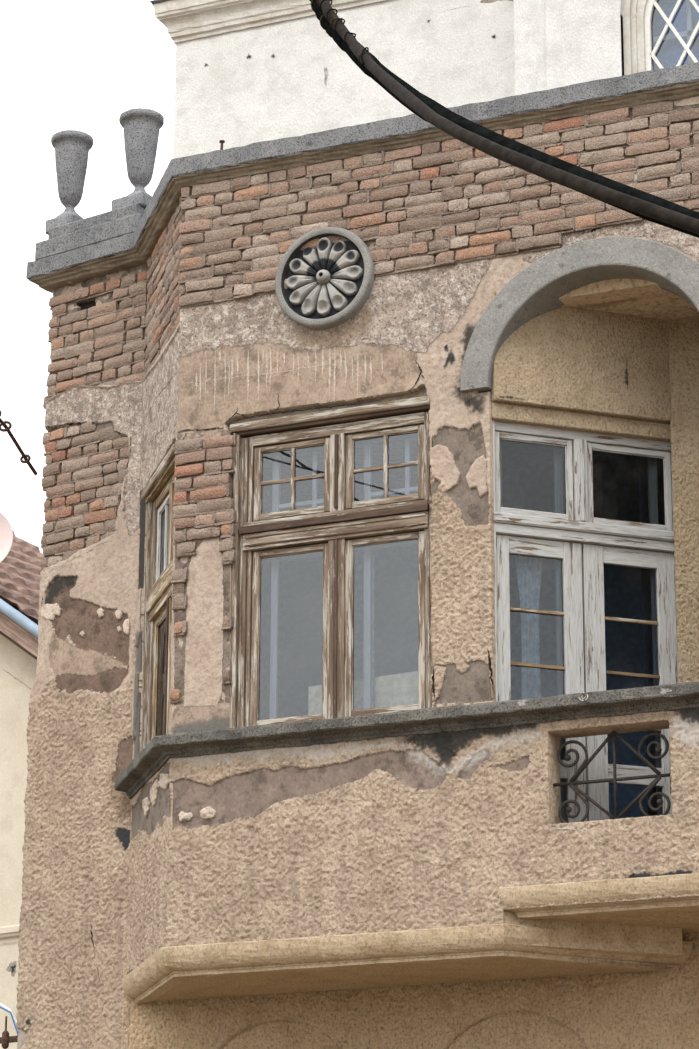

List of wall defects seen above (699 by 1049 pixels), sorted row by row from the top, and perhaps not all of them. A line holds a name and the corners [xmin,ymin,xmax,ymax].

spalling [494,96,699,212]
spalling [40,139,699,783]
peeling [116,749,530,850]